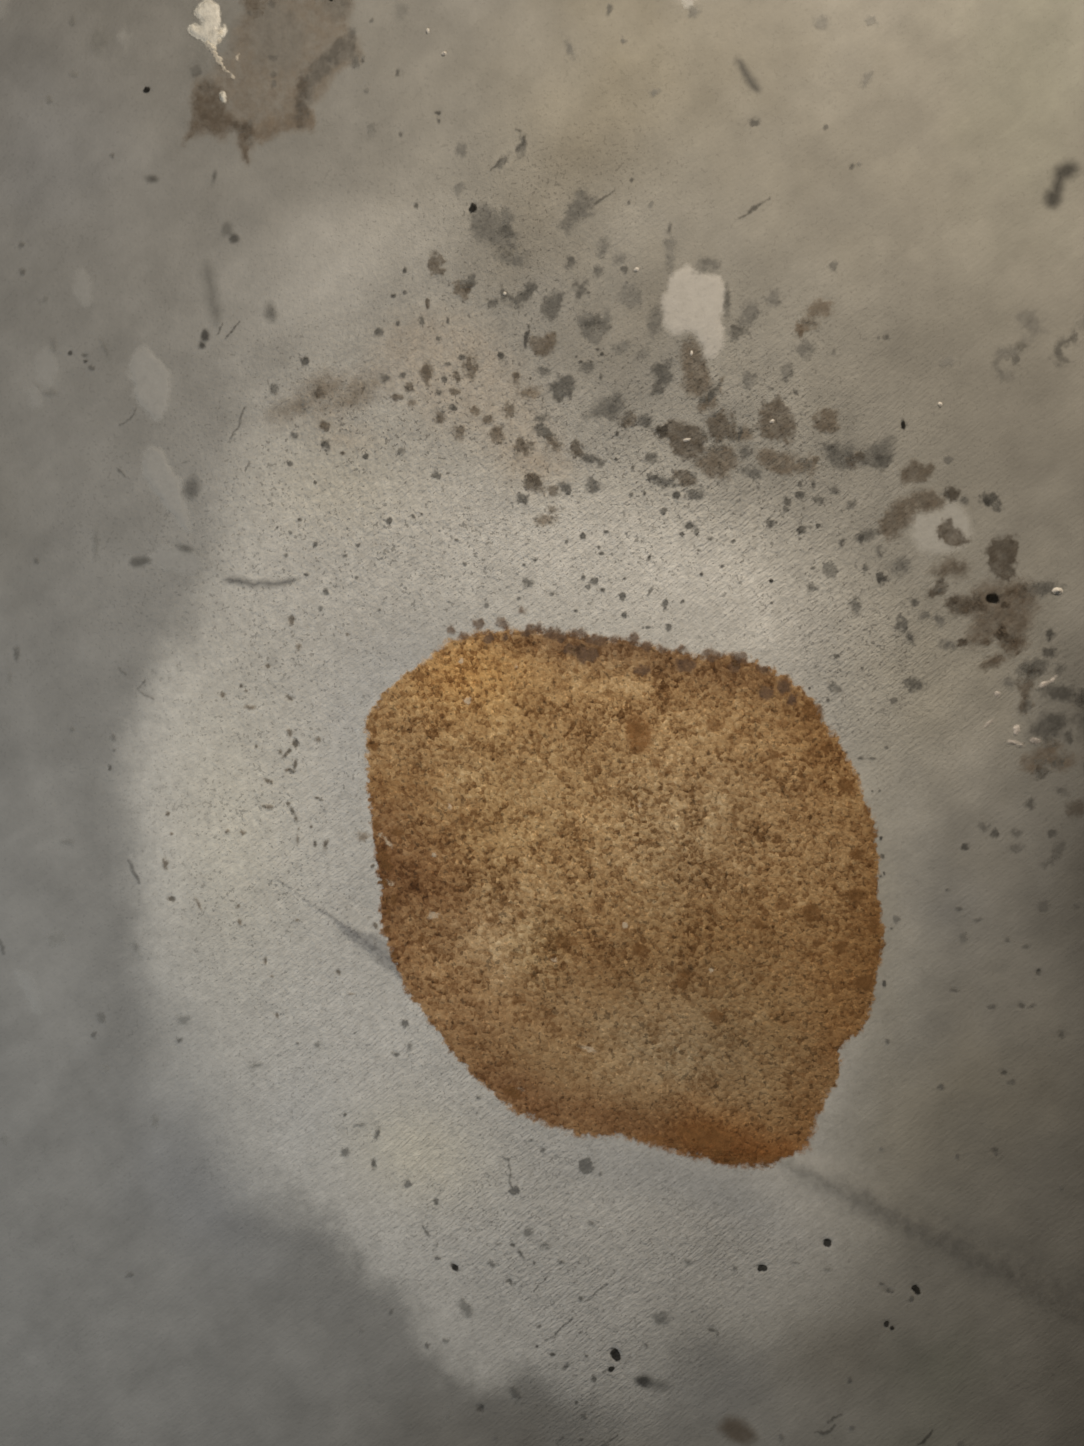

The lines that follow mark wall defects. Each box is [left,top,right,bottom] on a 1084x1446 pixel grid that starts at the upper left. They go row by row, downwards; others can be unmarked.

damp [188,0,252,157]
damp [782,299,830,381]
damp [593,342,799,500]
corrosion [365,610,886,1167]